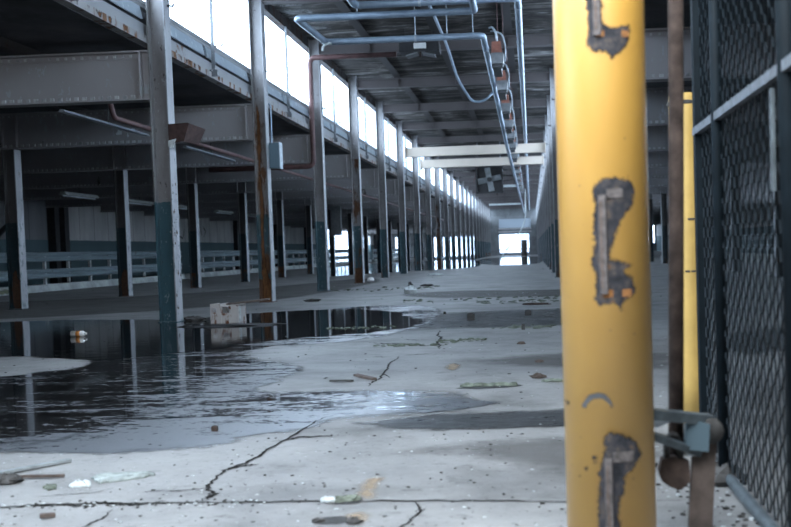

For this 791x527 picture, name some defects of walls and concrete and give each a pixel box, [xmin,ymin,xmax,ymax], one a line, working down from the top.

rust [256,106,272,301]
crack [369,330,443,386]
crack [1,416,330,527]
crack [349,499,567,527]